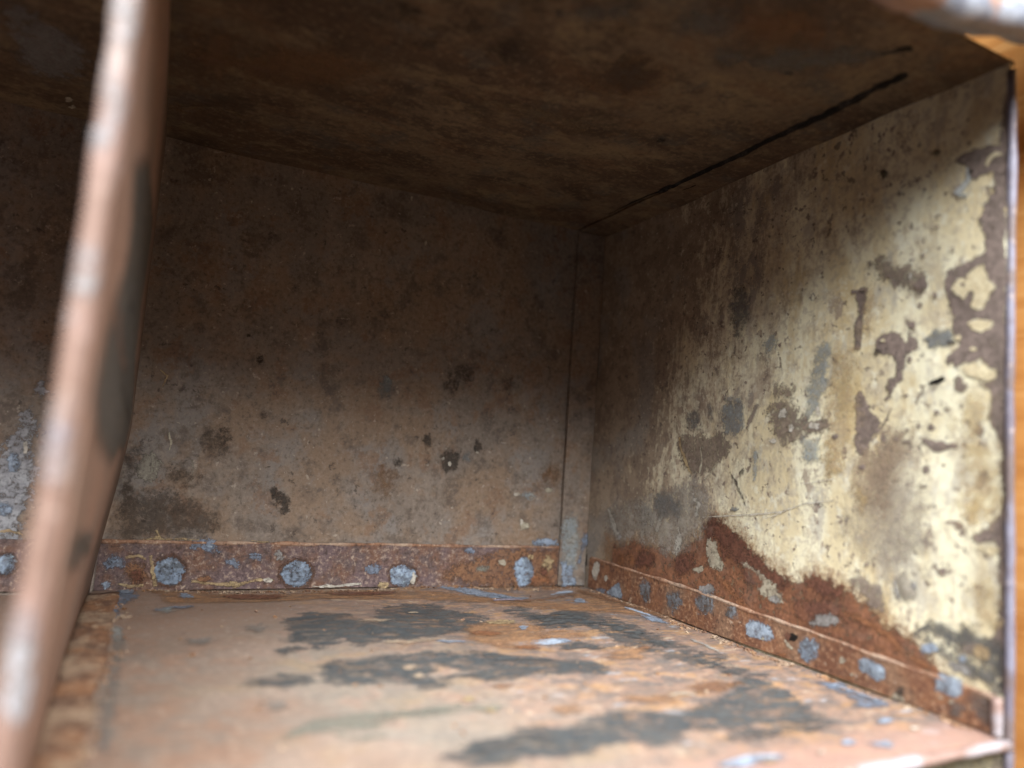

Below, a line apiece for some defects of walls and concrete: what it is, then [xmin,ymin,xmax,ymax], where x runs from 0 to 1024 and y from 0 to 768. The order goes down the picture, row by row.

crack [608,46,913,215]
peeling [0,407,73,540]
peeling [851,94,1008,695]
corrosion [955,394,1003,523]
corrosion [118,545,664,618]
water stain [239,533,841,768]
corrosion [628,680,742,702]
corrosion [605,511,947,675]